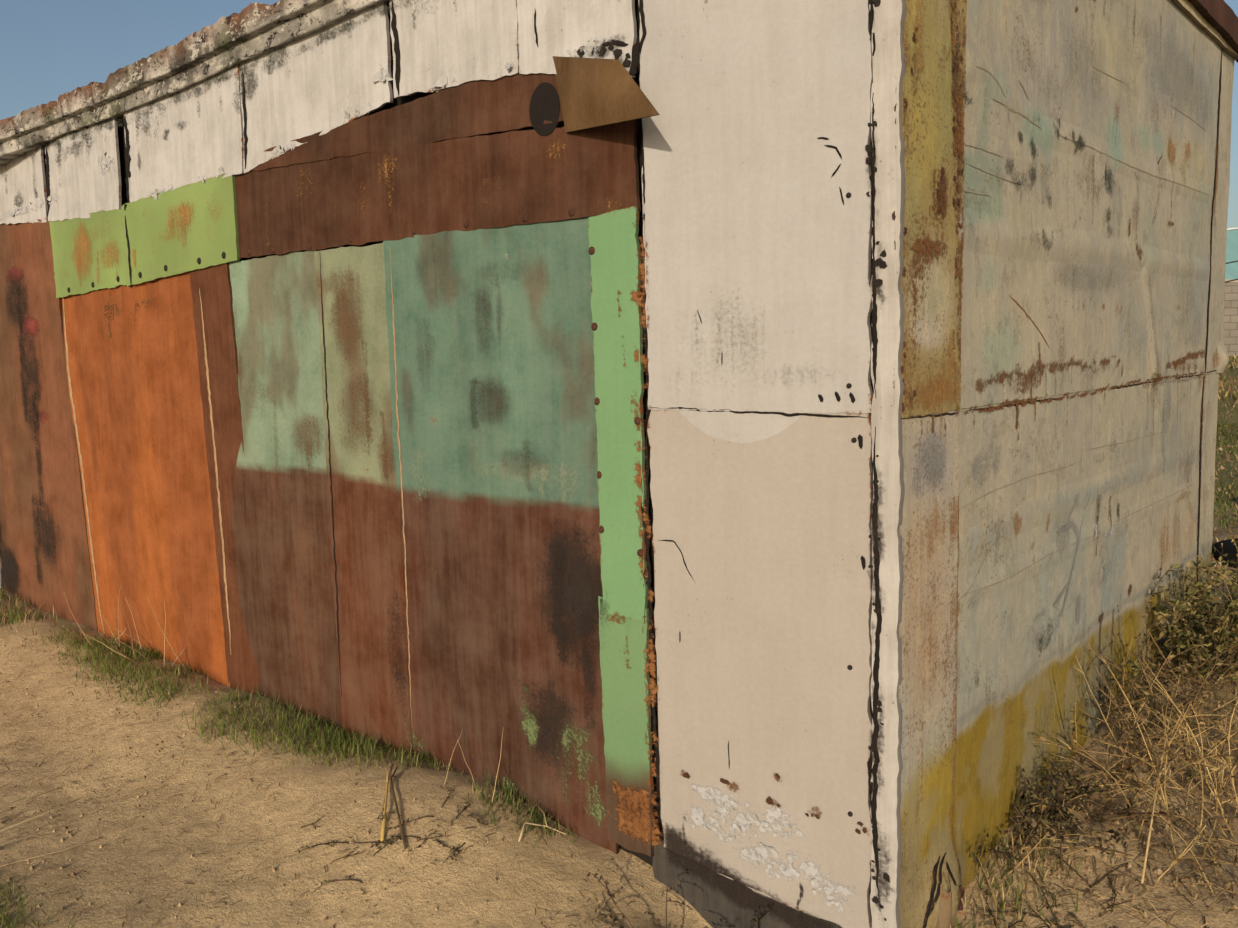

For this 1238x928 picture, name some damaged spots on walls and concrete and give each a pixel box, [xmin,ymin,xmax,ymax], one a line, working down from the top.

rust [912,0,967,375]
rust [617,223,649,388]
rust [0,218,260,695]
rust [631,400,652,538]
rust [920,343,1218,474]
rust [531,531,662,846]
leakage [664,826,830,928]